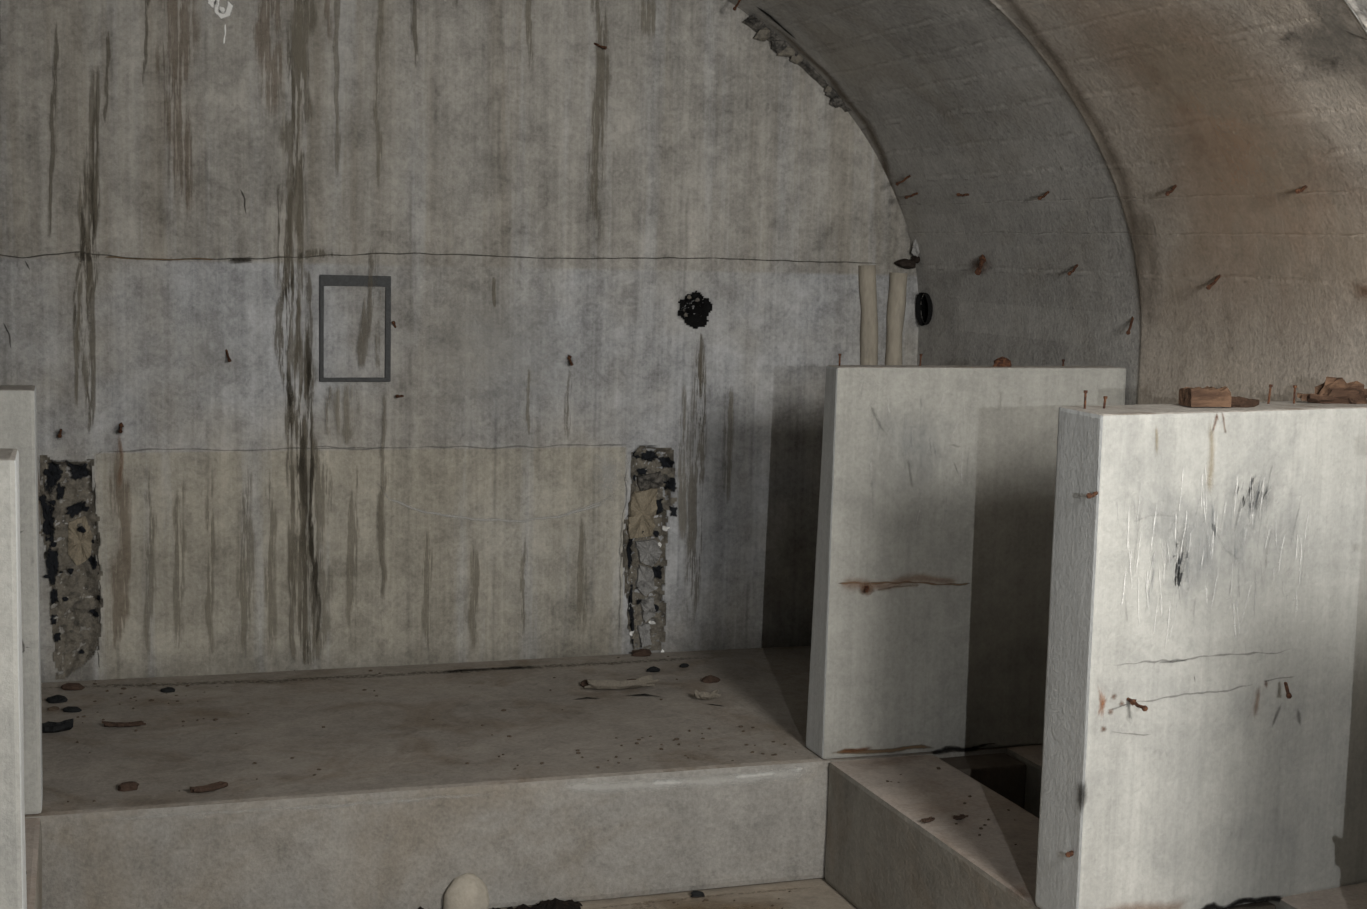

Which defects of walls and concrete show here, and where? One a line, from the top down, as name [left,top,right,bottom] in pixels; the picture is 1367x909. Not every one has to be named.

leakage [49,37,58,231]
leakage [74,34,110,427]
leakage [240,0,352,661]
leakage [358,253,380,364]
spalling [38,455,103,680]
leakage [378,399,604,626]
spalling [621,446,678,652]